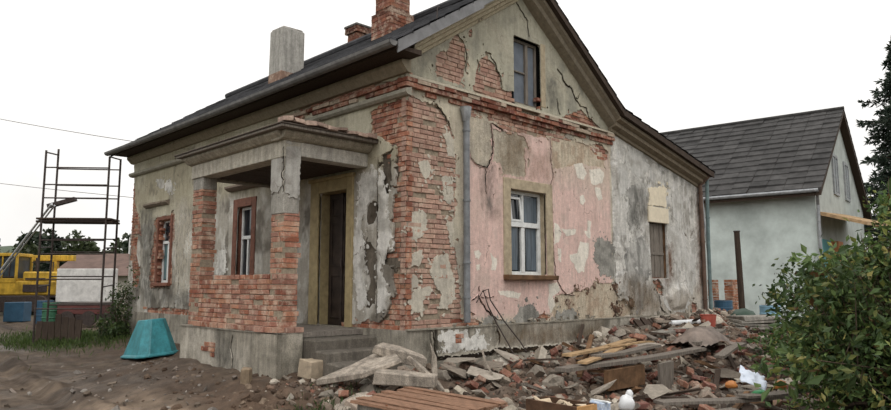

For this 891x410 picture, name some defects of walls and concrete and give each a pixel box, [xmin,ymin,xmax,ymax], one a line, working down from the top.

flaking render [435,30,514,103]
crack [557,69,598,127]
flaking render [470,109,607,201]
crack [548,137,556,185]
peeling [619,145,650,198]
flaking render [341,96,585,383]
crack [553,211,575,296]
peeling [554,221,591,273]
flaking render [536,267,647,349]
peeling [652,224,706,348]